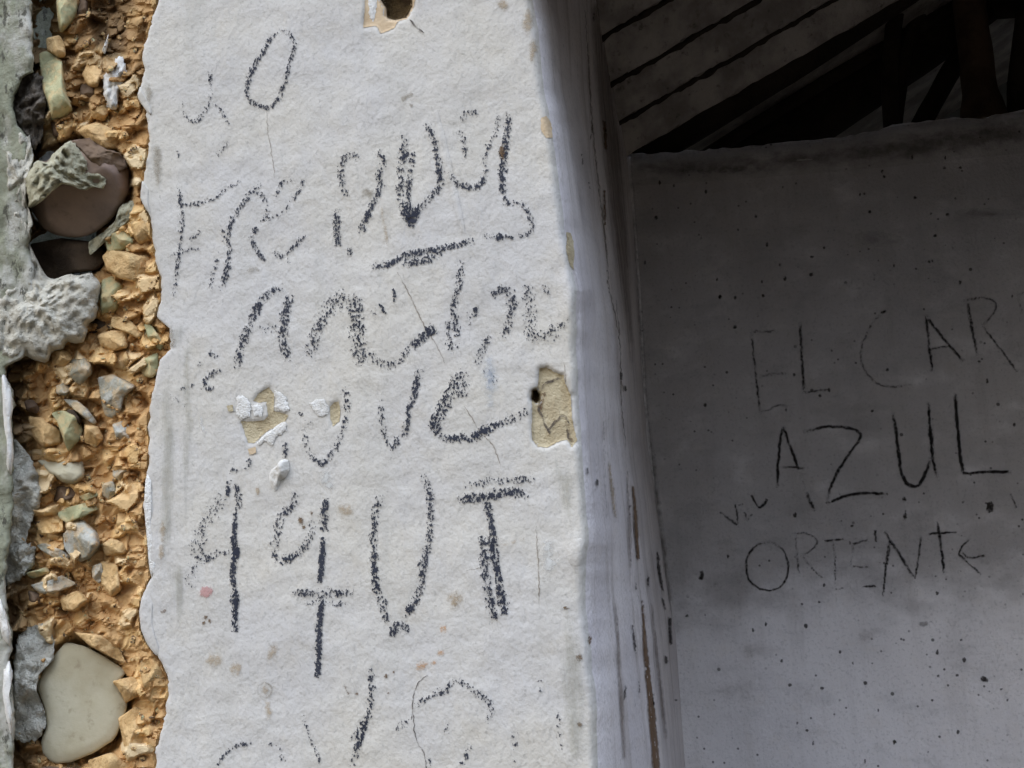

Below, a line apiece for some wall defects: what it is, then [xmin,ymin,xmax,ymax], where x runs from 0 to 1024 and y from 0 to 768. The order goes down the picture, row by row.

peeling [363,0,424,33]
flaking render [0,0,171,768]
peeling [226,387,290,454]
peeling [531,367,577,448]
corrosion [629,487,640,559]
corrosion [641,601,665,768]